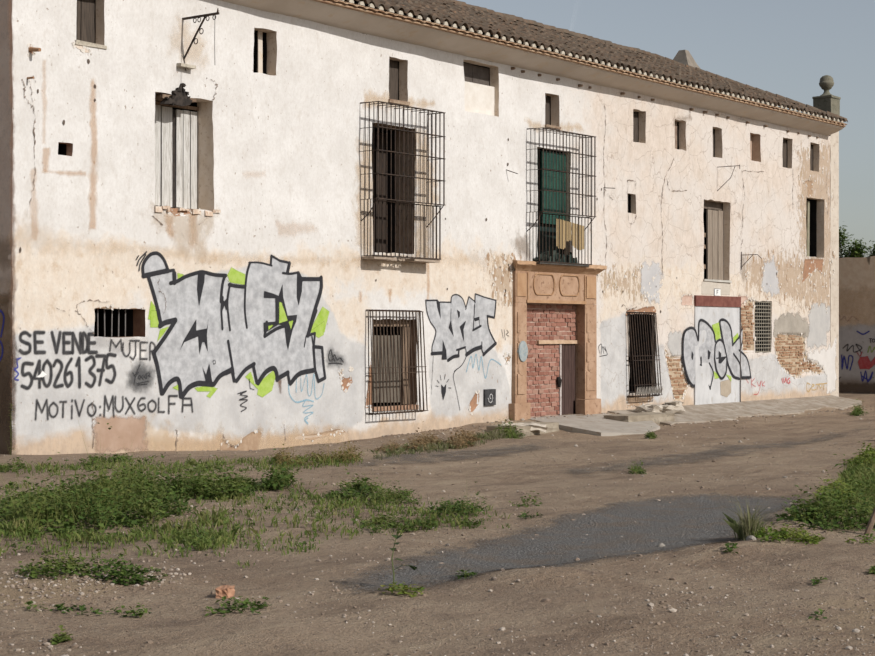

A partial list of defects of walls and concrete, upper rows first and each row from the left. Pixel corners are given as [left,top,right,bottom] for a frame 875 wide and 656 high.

flaking render [738,145,835,353]
flaking render [664,349,690,401]
flaking render [774,332,825,379]